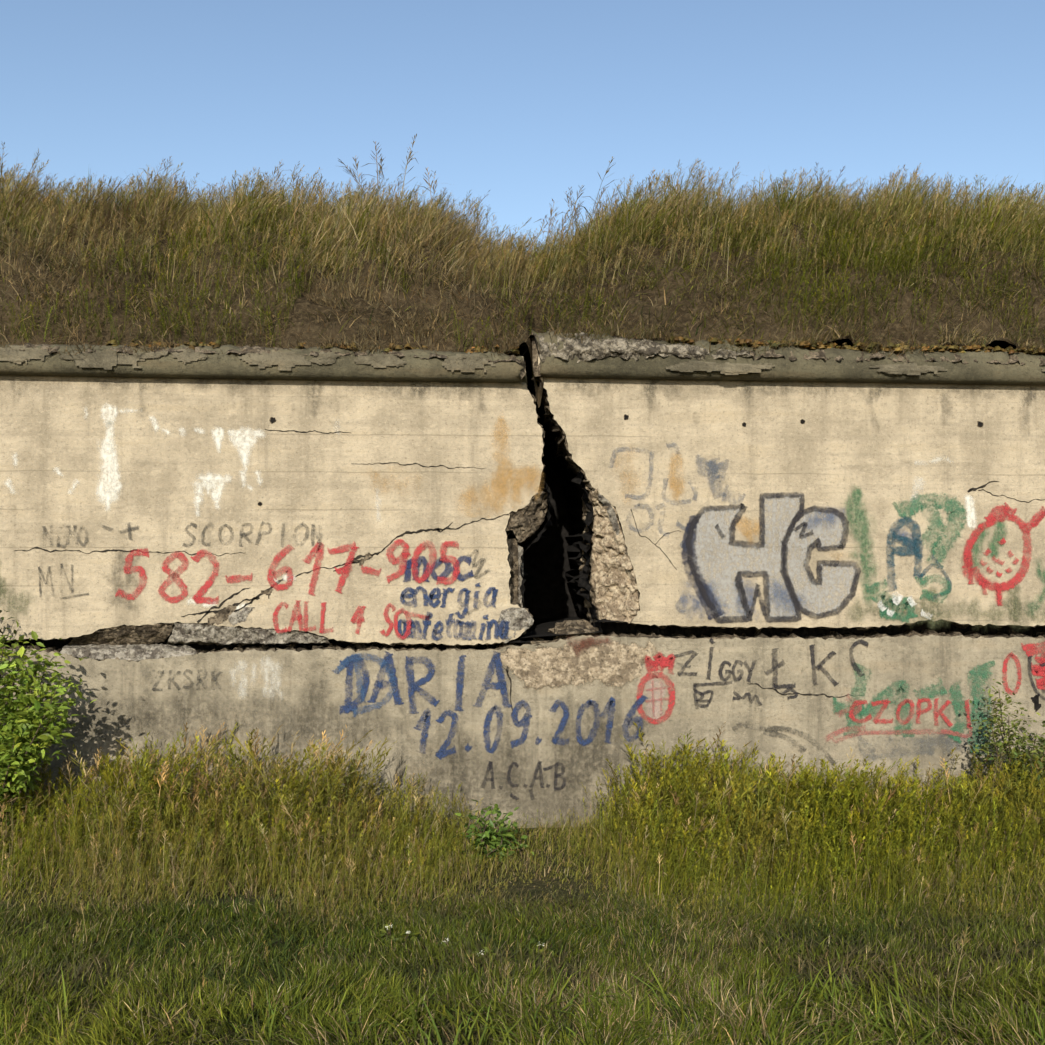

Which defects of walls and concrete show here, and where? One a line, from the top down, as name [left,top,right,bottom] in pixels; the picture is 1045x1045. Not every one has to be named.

flaking render [0,343,521,372]
spalling [538,332,1045,375]
water stain [99,405,132,508]
water stain [196,428,263,513]
crack [15,547,242,556]
crack [154,335,1045,719]
crack [2,638,100,661]
spalling [496,607,663,689]